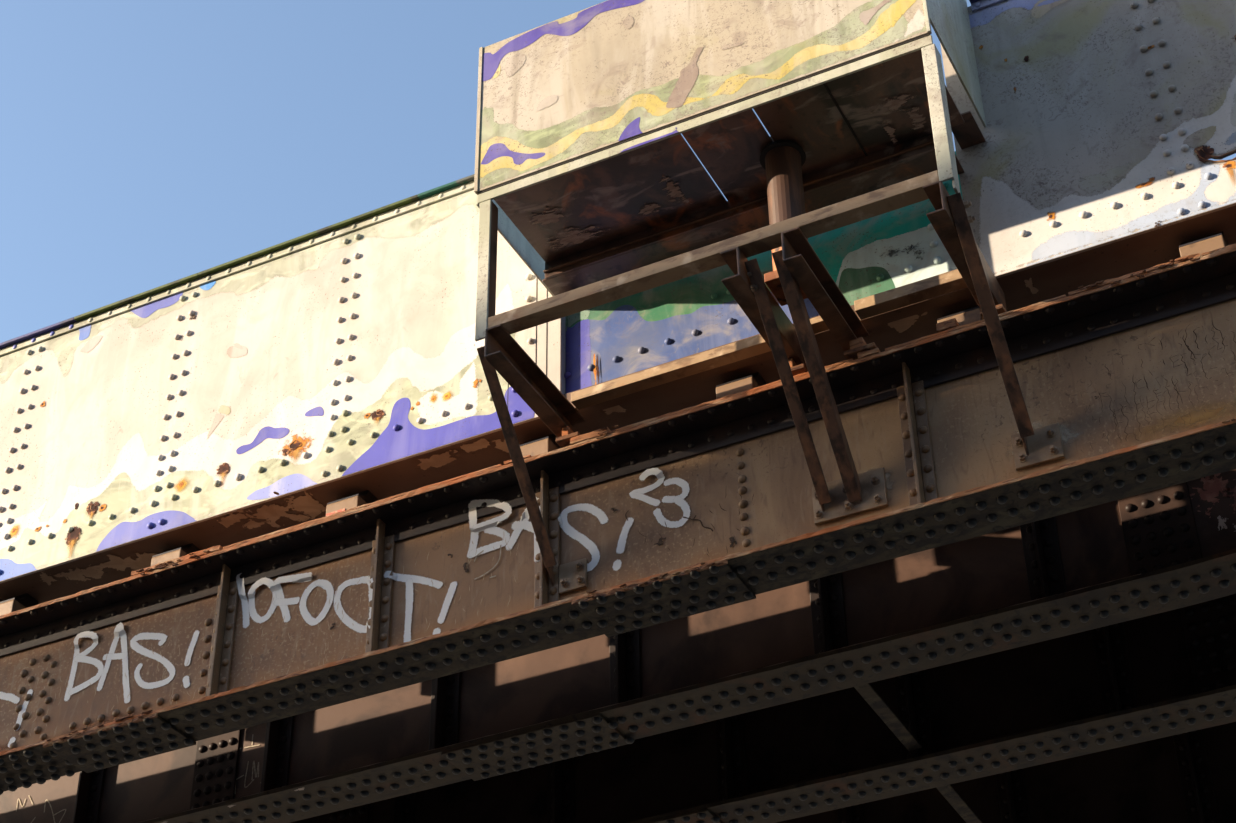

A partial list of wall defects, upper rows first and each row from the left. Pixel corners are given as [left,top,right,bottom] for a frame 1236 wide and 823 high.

rust [1197,145,1236,179]
crack [1047,320,1236,451]
rust [364,409,384,421]
rust [282,434,314,459]
peeling [417,438,509,470]
rust [216,463,230,480]
peeling [217,489,326,529]
peeling [1190,473,1236,532]
rust [63,501,106,554]
rust [135,550,210,575]